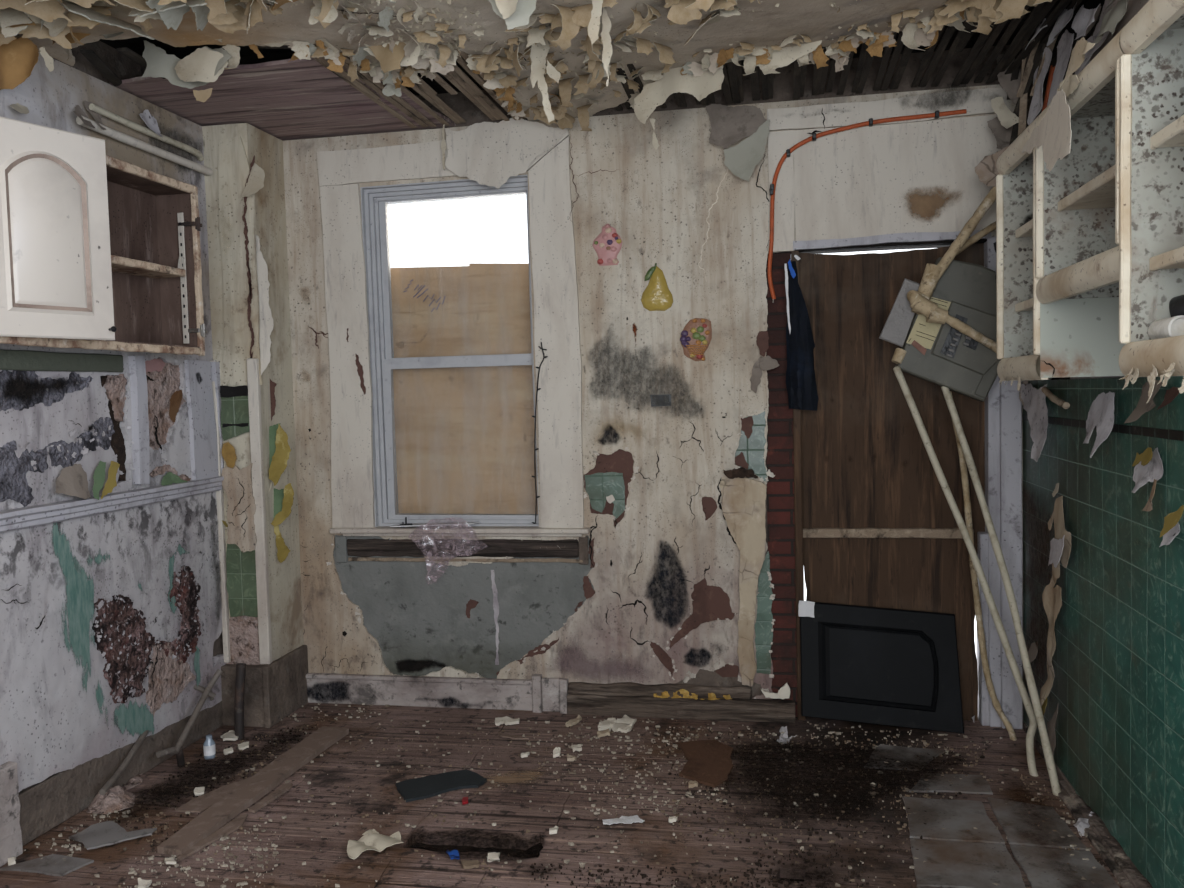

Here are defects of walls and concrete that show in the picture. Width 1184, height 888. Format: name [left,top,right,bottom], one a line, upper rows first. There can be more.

peeling [0,0,1053,131]
peeling [974,0,1128,186]
crack [242,155,255,358]
leakage [907,189,957,220]
spalling [0,370,135,507]
flaking render [326,535,601,679]
crack [589,515,617,567]
peeling [583,447,639,530]
crack [605,552,649,645]
leakage [591,339,702,415]
leakage [646,542,687,628]
crack [635,422,736,584]